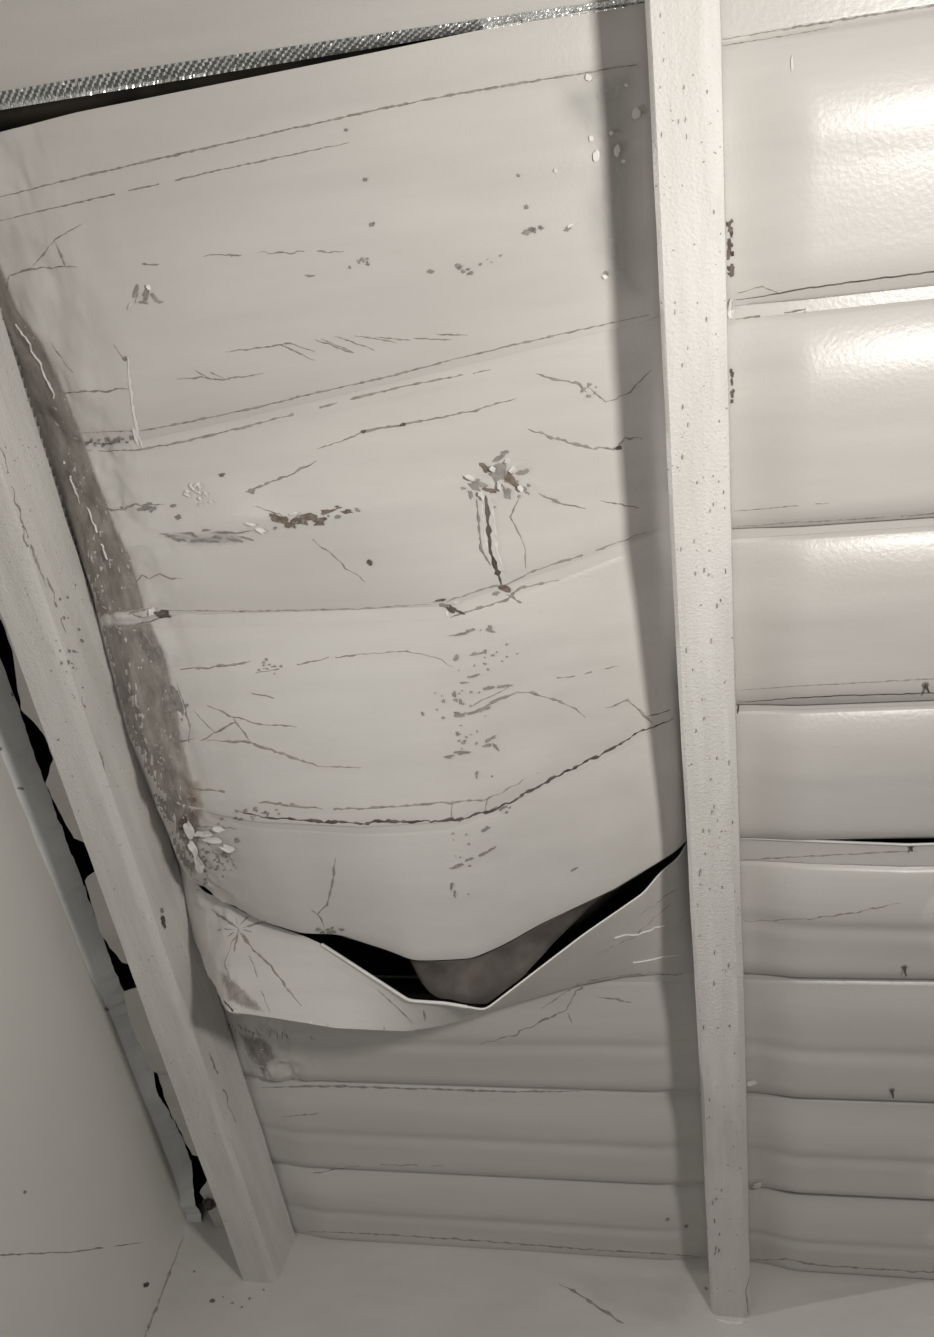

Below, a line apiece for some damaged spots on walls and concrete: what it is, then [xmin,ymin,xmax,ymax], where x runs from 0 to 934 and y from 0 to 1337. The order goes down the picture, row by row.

crack [51,343,126,395]
crack [86,315,651,494]
peeling [461,450,530,508]
crack [0,448,647,708]
crack [180,650,448,768]
crack [189,666,673,825]
crack [311,858,345,934]
peeling [449,821,496,898]
peeling [223,976,287,1068]
crack [0,1242,143,1256]
crack [308,1231,697,1257]
crack [714,1258,934,1324]